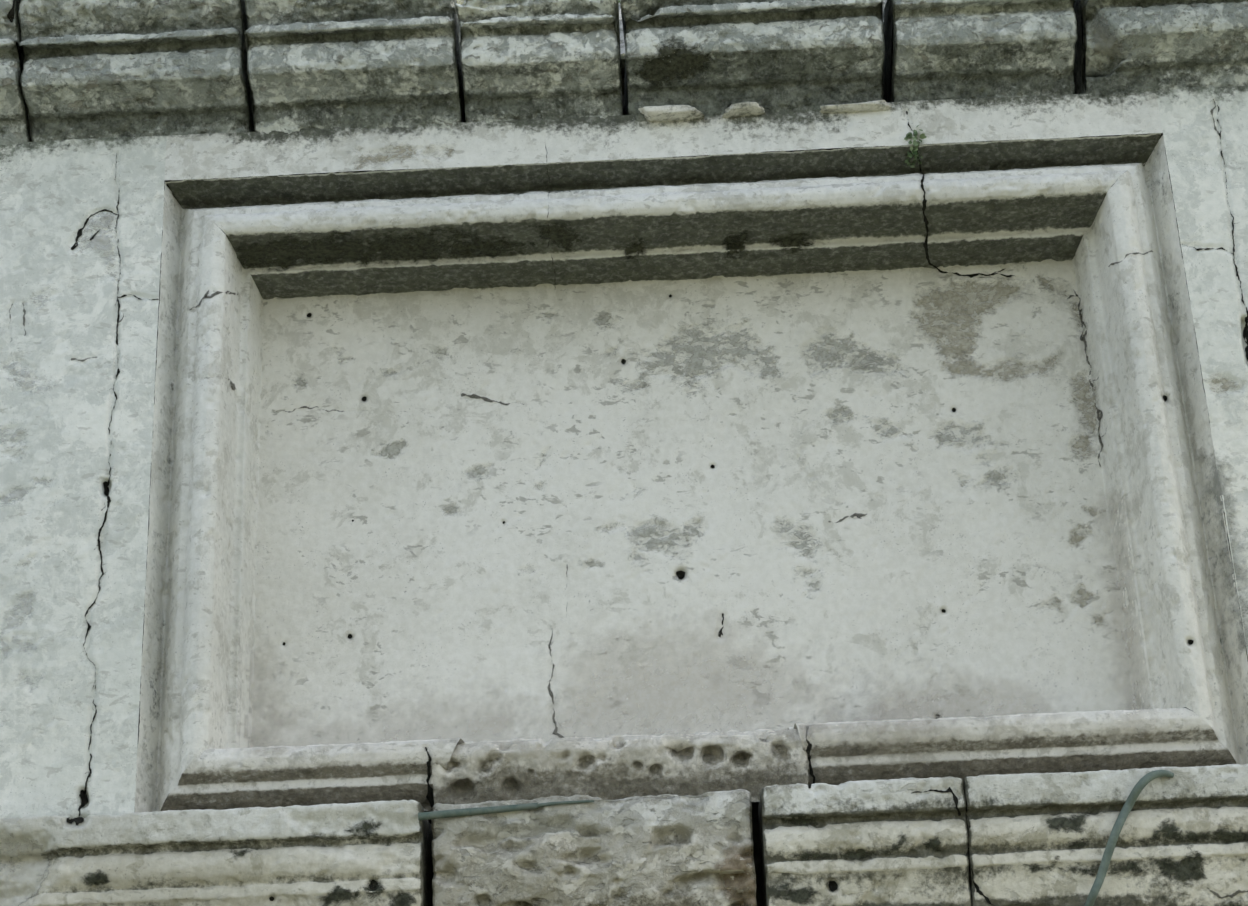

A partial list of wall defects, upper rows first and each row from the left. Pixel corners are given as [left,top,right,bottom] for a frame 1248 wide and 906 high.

crack [190,291,238,310]
crack [906,111,1015,278]
crack [1068,291,1106,466]
crack [1182,99,1248,360]
crack [67,153,158,825]
crack [548,608,567,738]